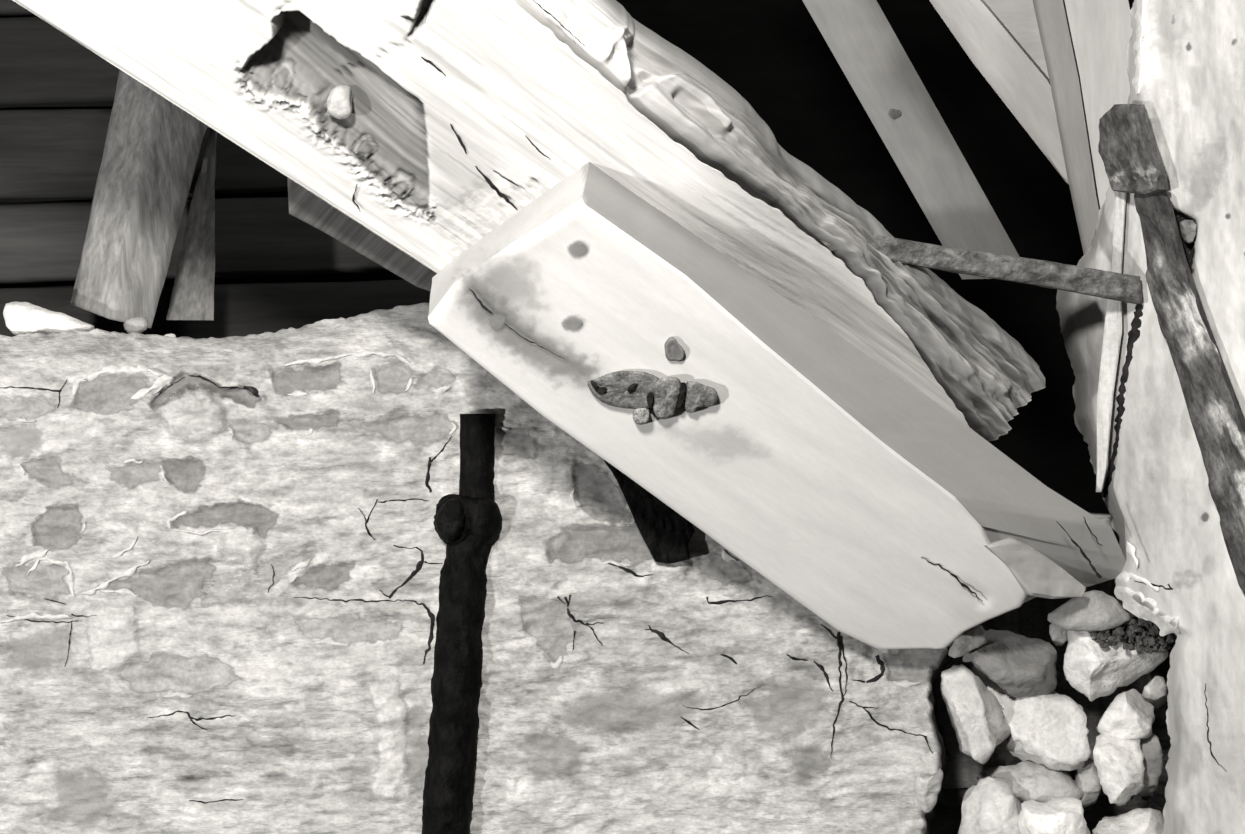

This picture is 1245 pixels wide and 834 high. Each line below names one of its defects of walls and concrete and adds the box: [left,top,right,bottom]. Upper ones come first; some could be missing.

crack [450,124,518,210]
spalling [0,396,55,423]
crack [1,380,67,408]
spalling [71,362,341,444]
crack [1056,304,1143,579]
crack [268,436,452,664]
crack [921,557,983,602]
crack [6,598,96,665]
crack [557,595,603,651]
crack [645,625,689,654]
crack [148,710,235,730]
crack [787,625,933,758]